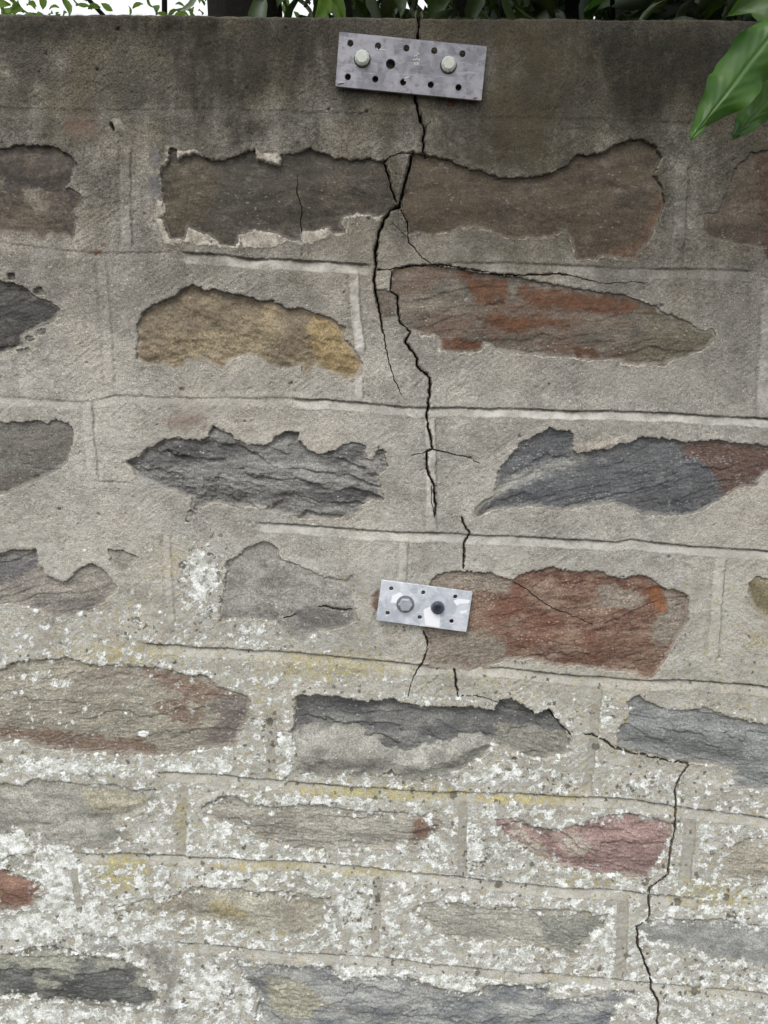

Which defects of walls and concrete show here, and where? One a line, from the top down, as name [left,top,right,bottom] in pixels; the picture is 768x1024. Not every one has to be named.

crack [415,10,423,40]
spalling [155,140,666,263]
spalling [135,284,363,381]
crack [372,95,648,517]
spalling [374,264,718,368]
spalling [128,426,388,524]
spalling [472,428,768,519]
crack [461,517,471,569]
crack [408,631,429,697]
spalling [423,566,689,680]
spalling [291,694,570,762]
crack [528,708,689,1024]